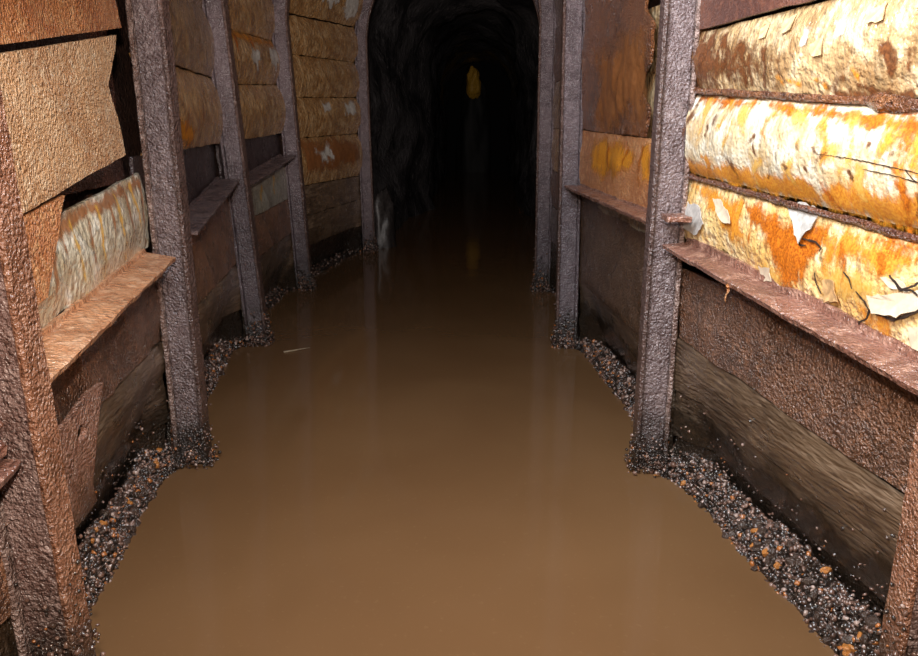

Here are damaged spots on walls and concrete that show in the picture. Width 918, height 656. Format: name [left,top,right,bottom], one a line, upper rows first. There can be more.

damp [322,0,359,20]
rust [682,30,918,336]
peeling [683,202,704,235]
peeling [712,198,730,224]
peeling [788,202,818,244]
crack [798,238,821,252]
peeling [758,266,771,282]
crack [843,271,918,325]
peeling [866,277,918,318]
peeling [908,327,918,351]